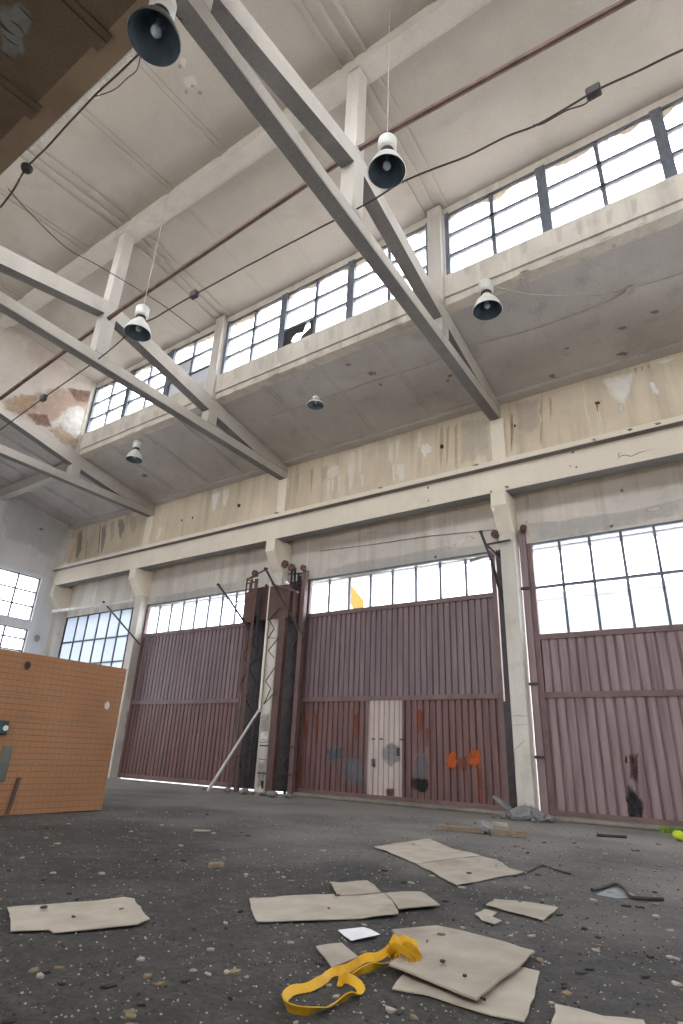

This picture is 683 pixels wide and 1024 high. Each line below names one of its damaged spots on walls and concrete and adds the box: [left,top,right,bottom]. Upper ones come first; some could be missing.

flaking render [7,382,116,446]
damp [417,416,491,468]
damp [510,392,552,446]